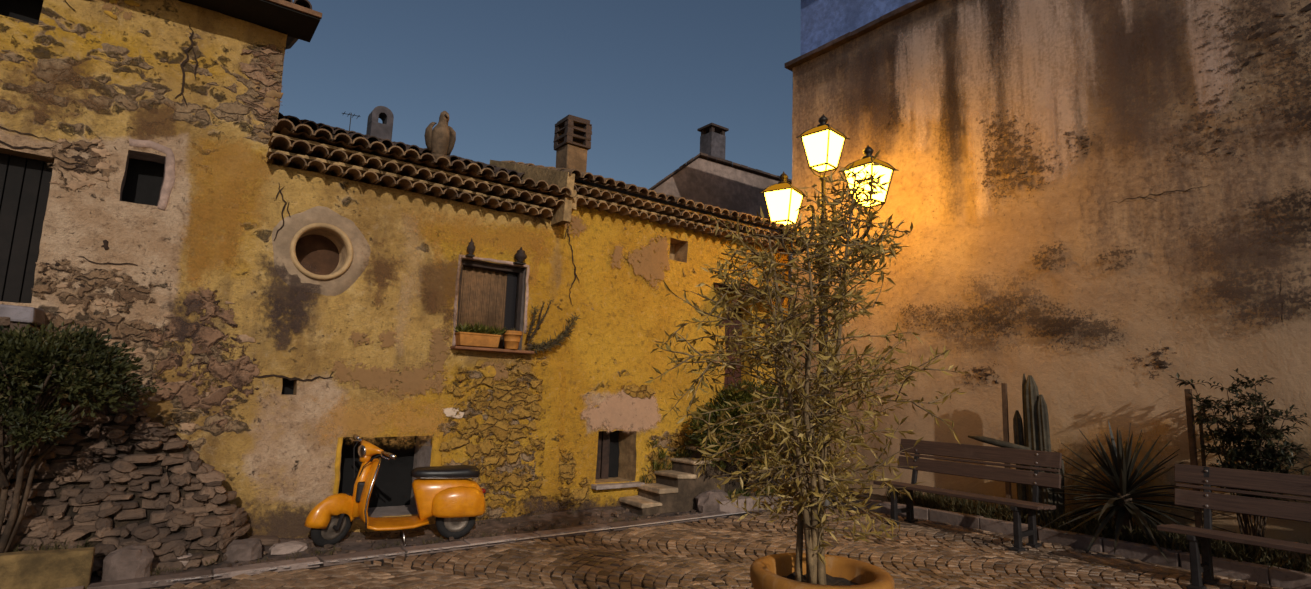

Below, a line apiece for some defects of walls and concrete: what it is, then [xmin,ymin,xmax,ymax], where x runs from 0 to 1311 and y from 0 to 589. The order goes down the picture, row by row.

crack [175,25,198,105]
flaking render [240,44,284,139]
leakage [799,0,1092,216]
leakage [1187,0,1233,113]
flaking render [31,258,261,432]
crack [274,184,290,241]
leakage [262,261,320,350]
crack [247,361,339,384]
flaking render [331,328,591,520]
flaking render [581,385,697,484]
leakage [900,242,1124,352]
leakage [1189,181,1311,329]